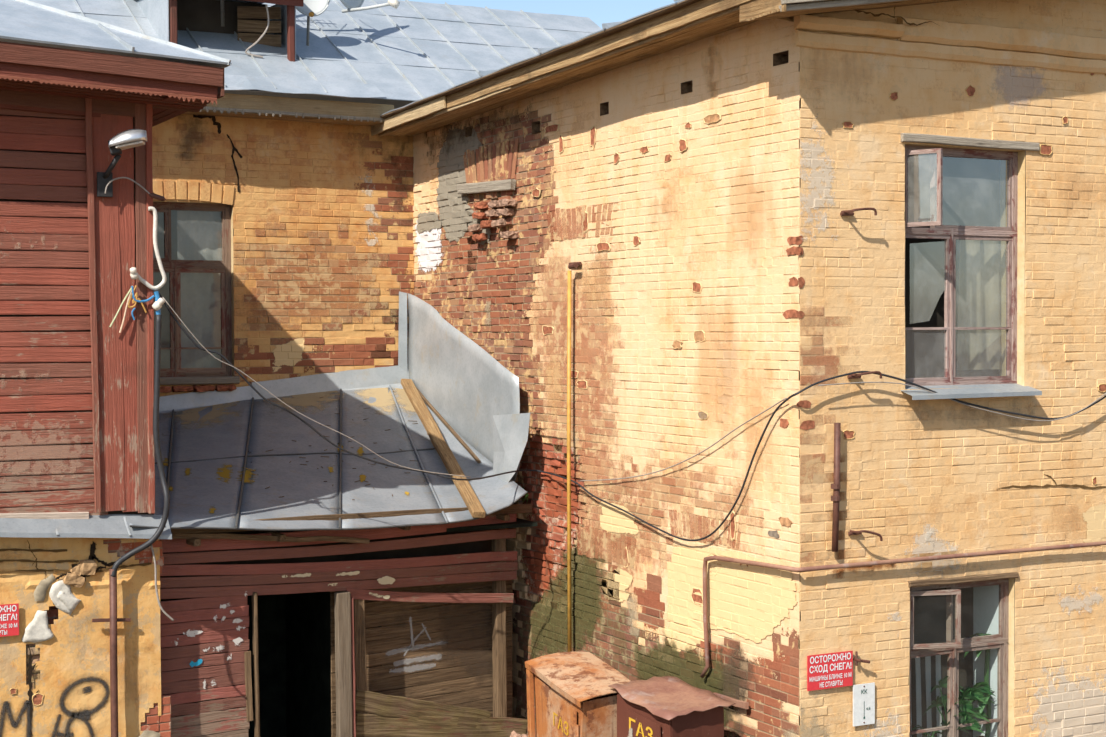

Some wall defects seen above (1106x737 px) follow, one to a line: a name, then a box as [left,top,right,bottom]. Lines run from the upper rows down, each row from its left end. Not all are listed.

crack [193,115,242,192]
flaking render [234,106,799,737]
flaking render [780,400,824,484]
crack [998,474,1106,489]
crack [27,645,39,737]
flaking render [141,696,171,737]